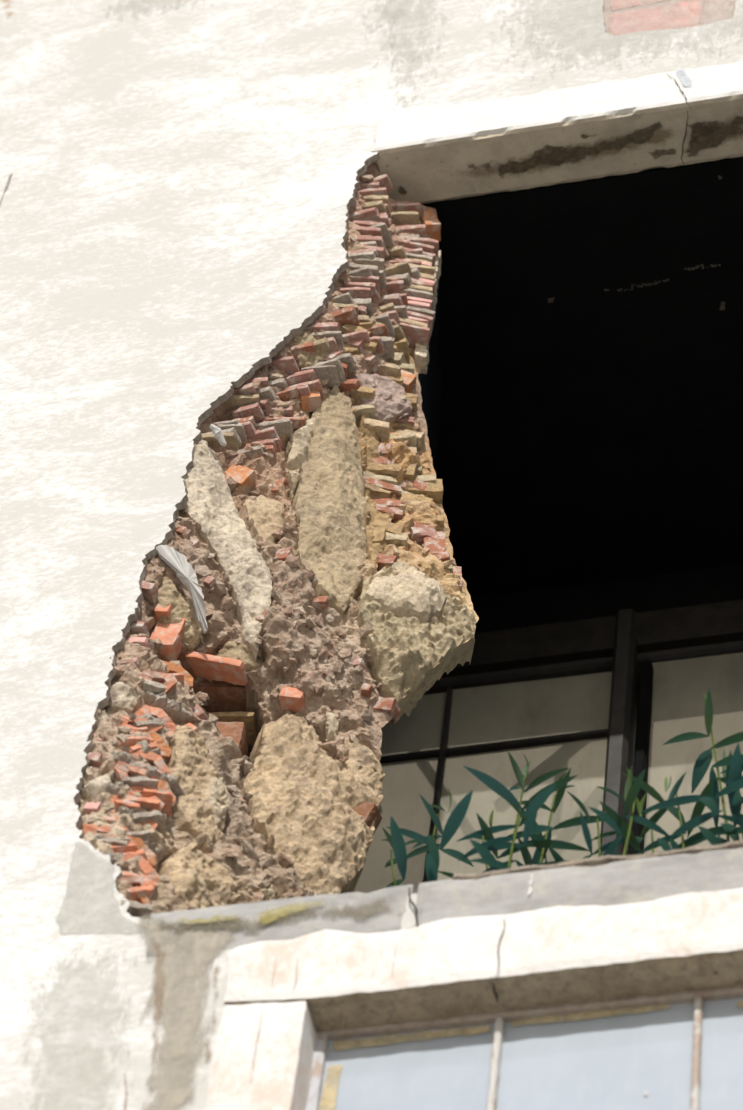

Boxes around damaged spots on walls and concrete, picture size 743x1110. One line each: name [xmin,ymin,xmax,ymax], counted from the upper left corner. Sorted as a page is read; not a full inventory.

flaking render [604,0,736,36]
water stain [468,116,743,176]
crack [666,73,689,164]
spalling [76,163,479,919]
crack [493,920,505,1002]